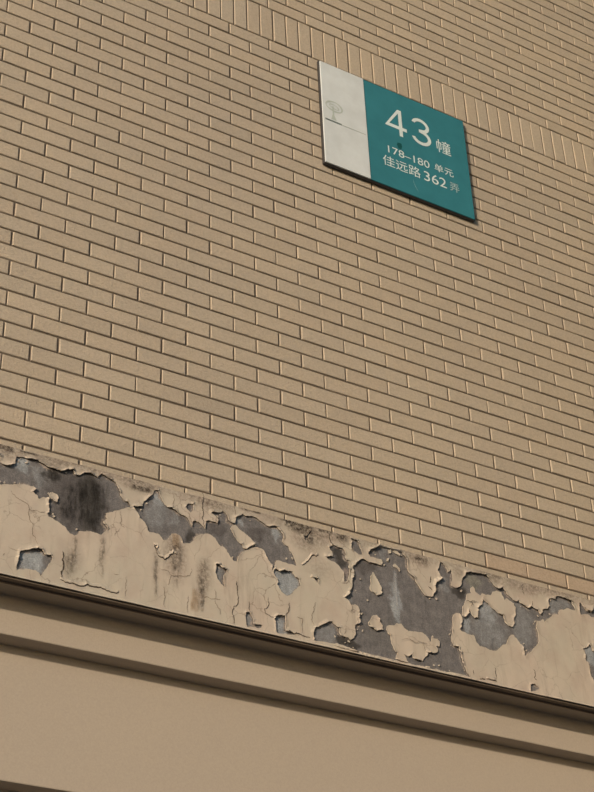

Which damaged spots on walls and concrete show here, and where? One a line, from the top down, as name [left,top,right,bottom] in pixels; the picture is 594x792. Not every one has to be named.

crack [60,552,127,596]
peeling [0,458,300,596]
crack [154,542,190,605]
crack [302,534,333,565]
crack [187,583,316,638]
peeling [246,613,261,628]
peeling [275,616,295,635]
peeling [314,539,594,679]